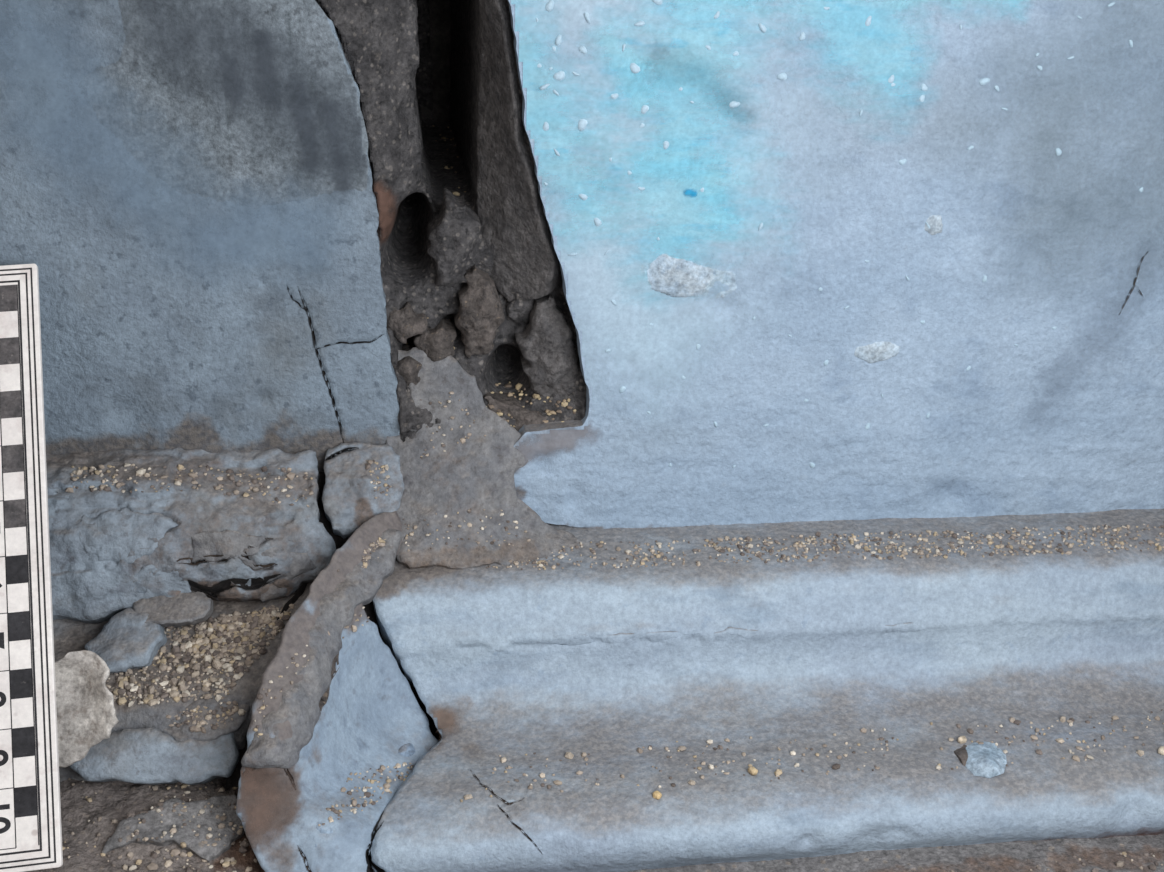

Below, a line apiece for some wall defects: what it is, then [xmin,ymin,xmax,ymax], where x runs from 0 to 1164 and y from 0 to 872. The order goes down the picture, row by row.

spalling [85,0,587,442]
water stain [511,0,769,370]
crack [1119,252,1148,315]
crack [287,287,384,550]
flaking render [46,448,439,872]
crack [364,601,386,644]
crack [399,668,442,740]
crack [226,738,255,788]
crack [366,811,385,872]
crack [474,774,542,853]